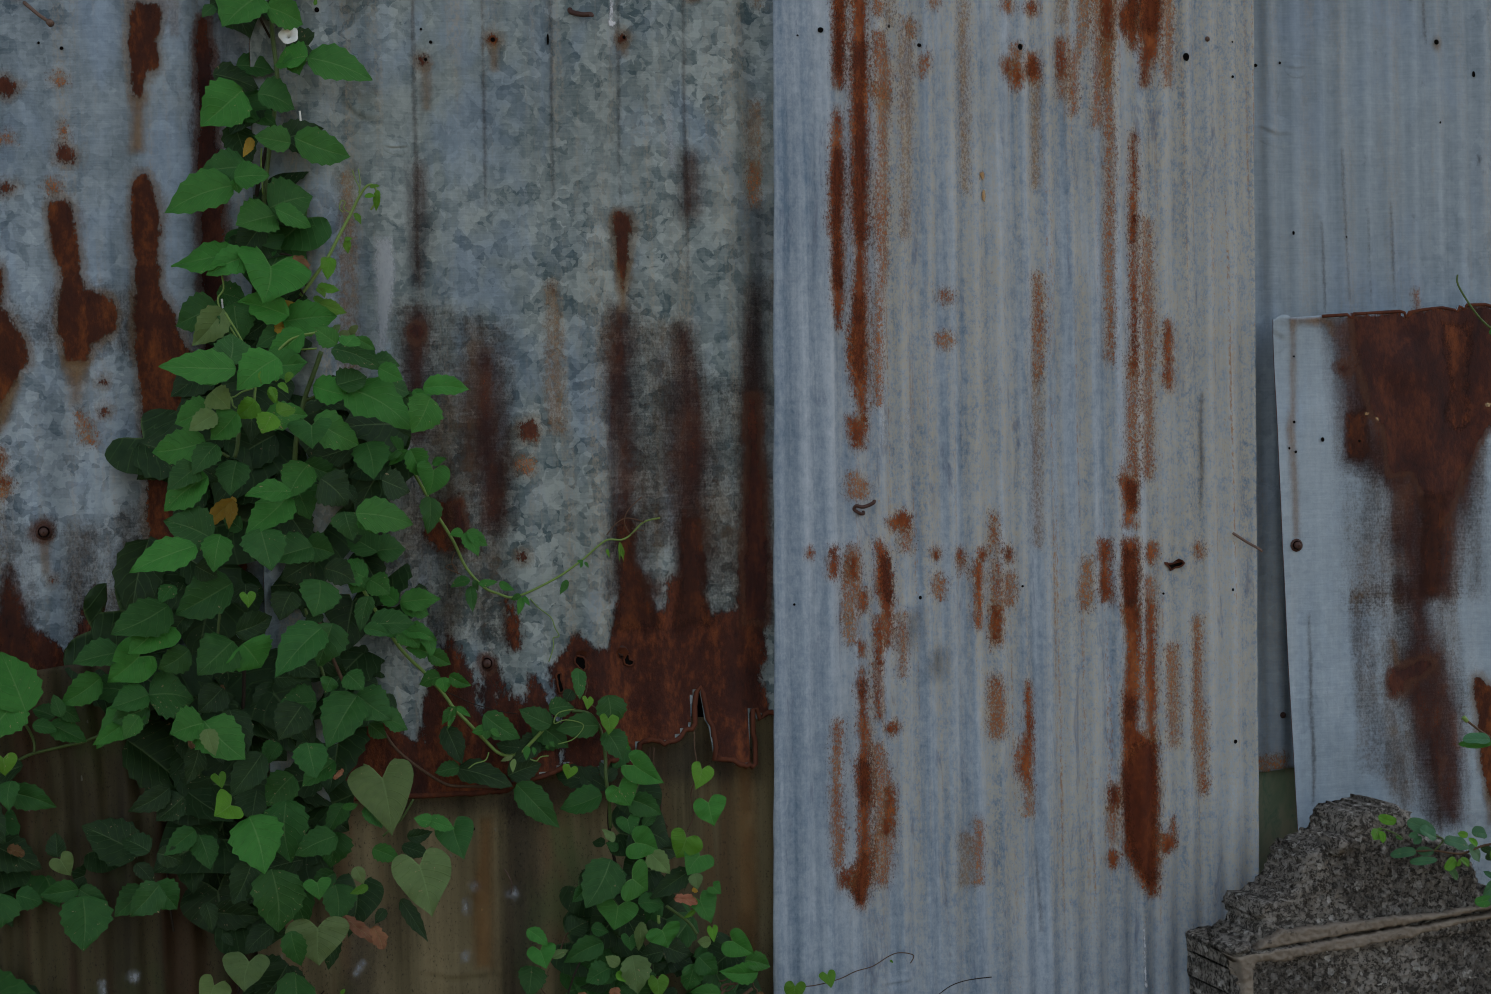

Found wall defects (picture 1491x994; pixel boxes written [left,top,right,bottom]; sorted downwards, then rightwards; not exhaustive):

rust [0,181,16,196]
rust [0,267,30,426]
rust [38,122,214,449]
rust [127,0,165,149]
rust [122,479,174,545]
rust [345,210,773,794]
rust [826,0,933,452]
rust [804,506,1018,910]
rust [985,673,1037,819]
rust [999,0,1211,900]
rust [1309,289,1491,824]